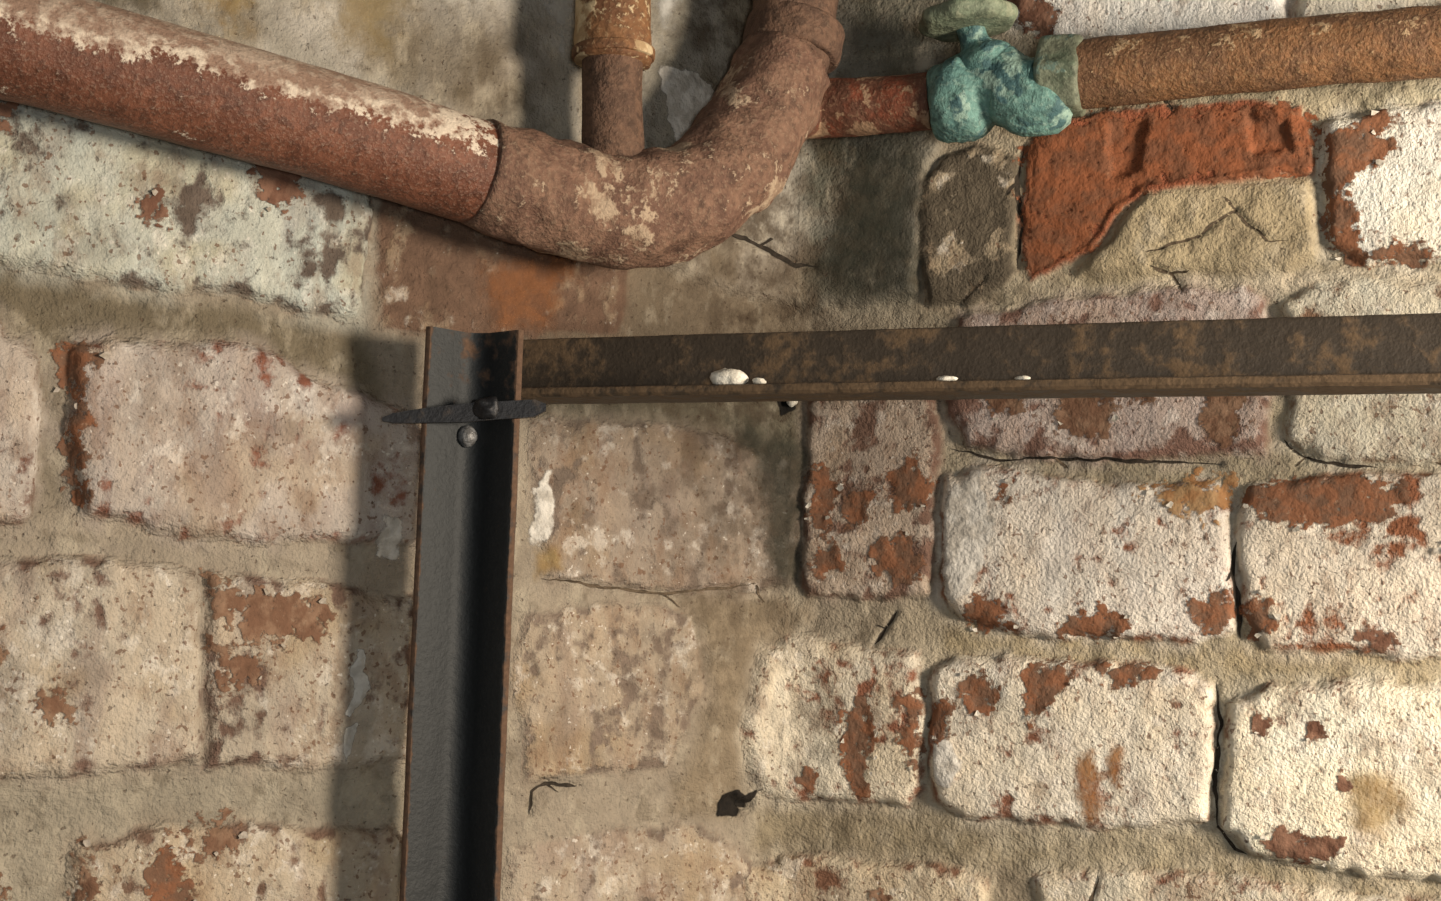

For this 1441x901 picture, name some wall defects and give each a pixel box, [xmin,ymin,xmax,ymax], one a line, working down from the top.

crack [1147,197,1289,291]
spalling [1011,97,1438,276]
peeling [47,337,110,508]
peeling [803,447,940,589]
peeling [1131,466,1412,544]
peeling [836,663,1001,802]
peeling [1017,598,1132,730]
peeling [1095,658,1163,692]
crack [1212,684,1246,854]
peeling [1186,586,1282,642]
peeling [141,807,248,901]
crack [1089,878,1099,901]